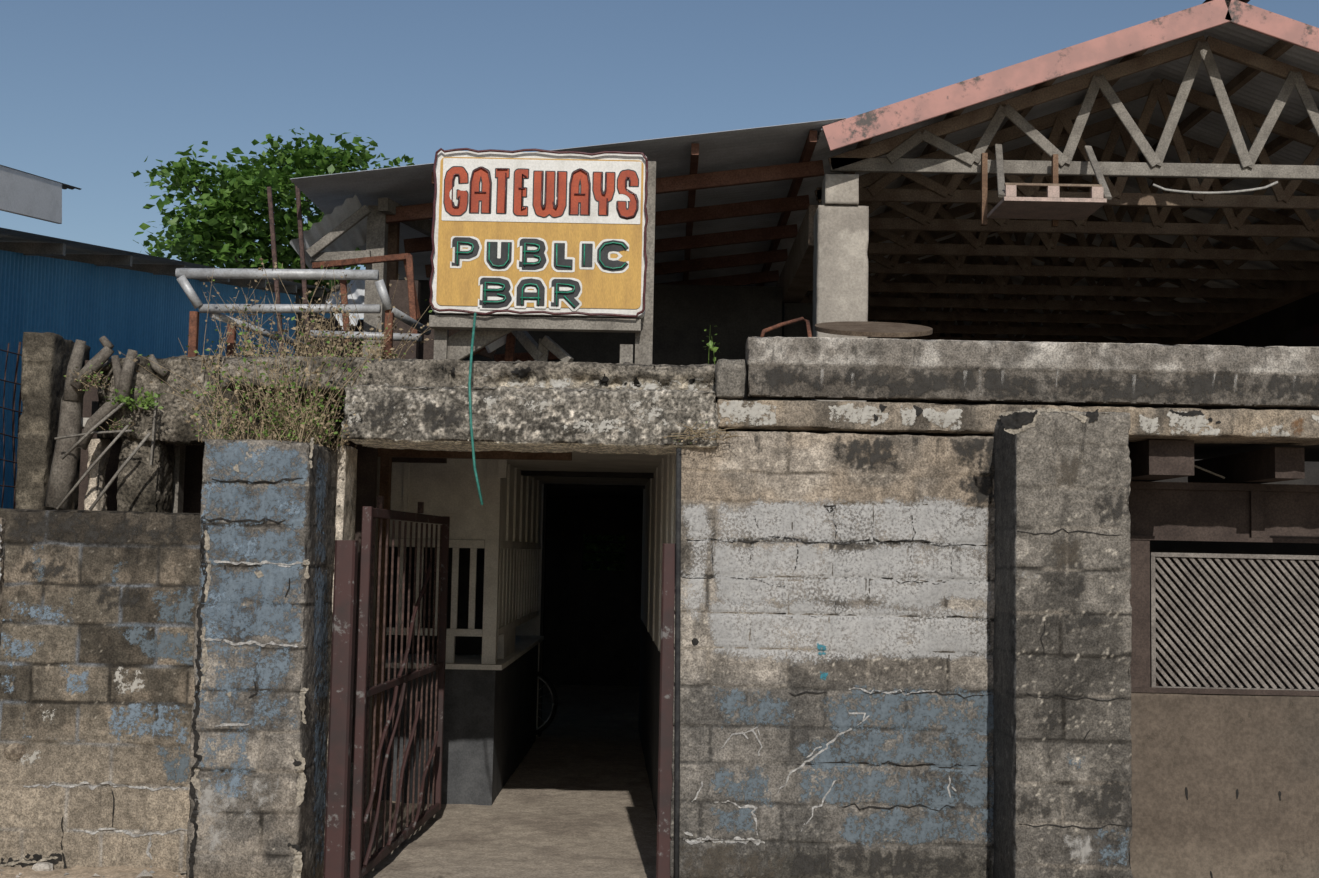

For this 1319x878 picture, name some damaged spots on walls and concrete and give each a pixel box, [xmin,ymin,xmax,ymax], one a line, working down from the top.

flaking render [718,400,776,426]
flaking render [828,403,963,430]
spalling [999,408,1099,434]
flaking render [1139,410,1221,436]
flaking render [1252,423,1290,437]
leakage [835,437,896,469]
leakage [953,438,995,508]
crack [1017,528,1118,536]
crack [1027,693,1124,740]
crack [721,727,763,756]
crack [778,687,991,832]
crack [1020,822,1123,830]